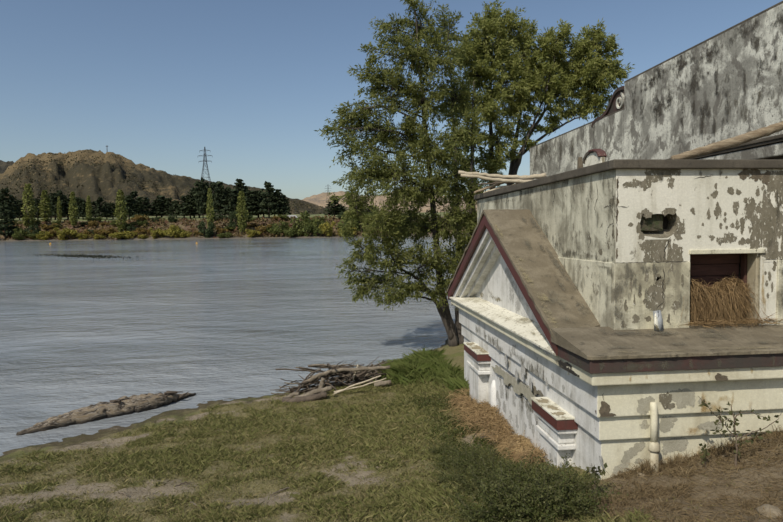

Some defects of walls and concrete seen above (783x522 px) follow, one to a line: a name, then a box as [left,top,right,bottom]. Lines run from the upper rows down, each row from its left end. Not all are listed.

damp [735,21,765,52]
damp [632,68,672,127]
damp [676,45,747,135]
peeling [598,169,681,259]
peeling [628,208,685,287]
peeling [697,169,783,298]
peeling [621,272,680,328]
spalling [558,360,579,377]
spalling [595,401,616,417]
peeling [637,388,711,455]